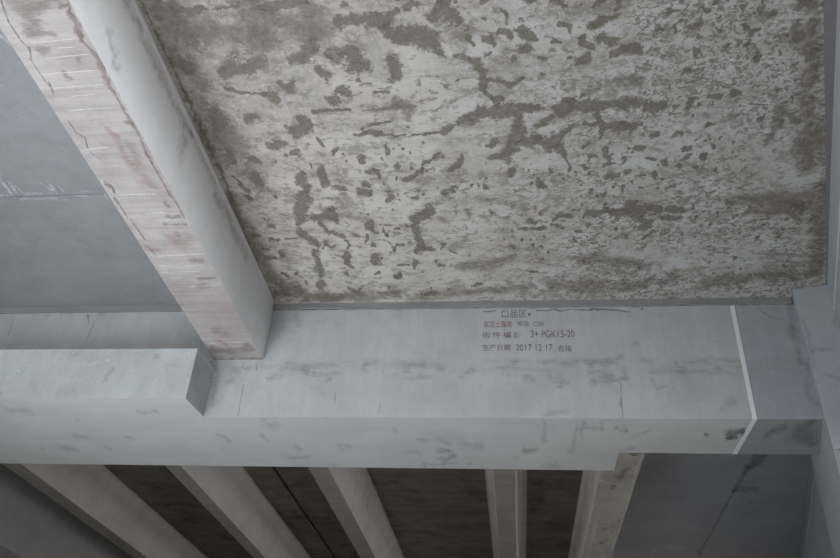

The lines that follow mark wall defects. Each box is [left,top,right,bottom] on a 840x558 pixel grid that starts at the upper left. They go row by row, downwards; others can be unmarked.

leakage [654,0,722,34]
leakage [741,23,761,47]
leakage [765,0,825,168]
leakage [153,0,685,301]
leakage [726,183,826,275]